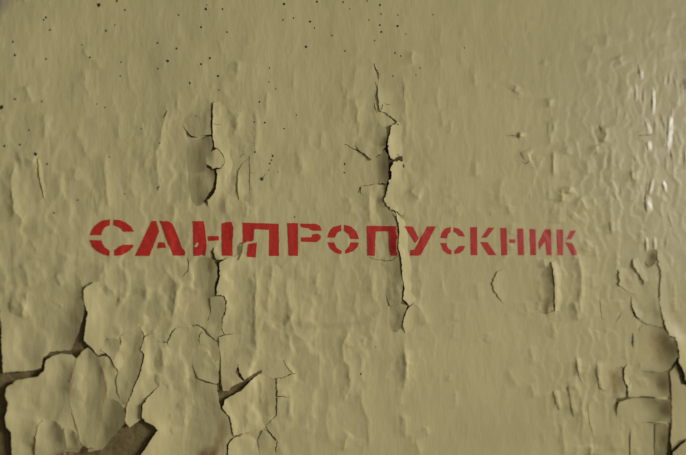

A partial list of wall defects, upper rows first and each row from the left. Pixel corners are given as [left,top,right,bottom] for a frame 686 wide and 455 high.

crack [374,64,404,125]
peeling [0,243,294,455]
peeling [597,249,686,455]